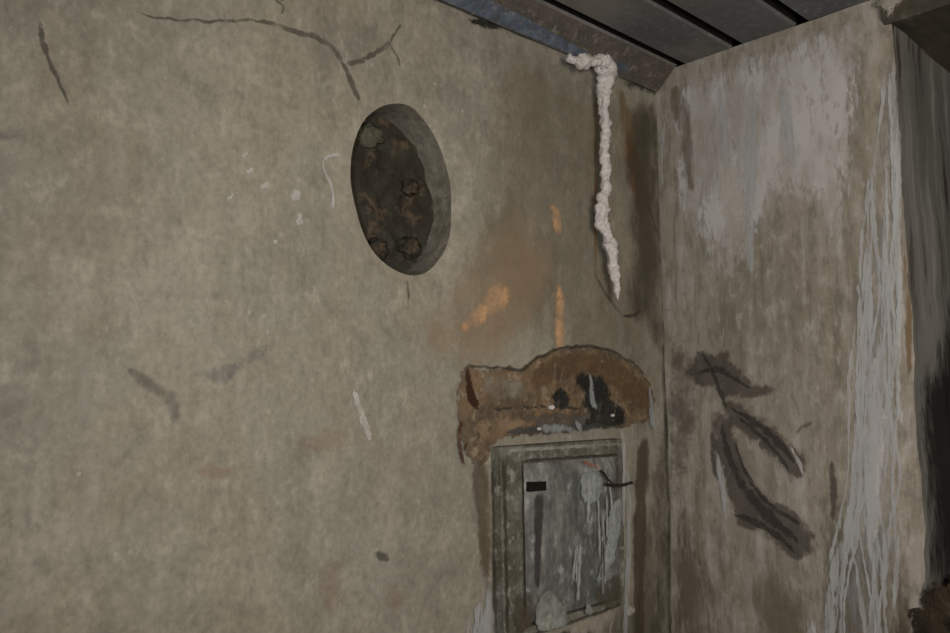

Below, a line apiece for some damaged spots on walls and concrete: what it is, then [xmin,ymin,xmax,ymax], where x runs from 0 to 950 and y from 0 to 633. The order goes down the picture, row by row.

crack [39,28,68,101]
crack [147,0,401,100]
peeling [444,0,589,56]
water stain [871,0,901,17]
water stain [630,33,858,314]
corrosion [555,287,564,346]
water stain [824,68,902,633]
spalling [457,344,655,577]
water stain [609,401,671,633]
water stain [717,454,726,515]
water stain [467,552,497,633]